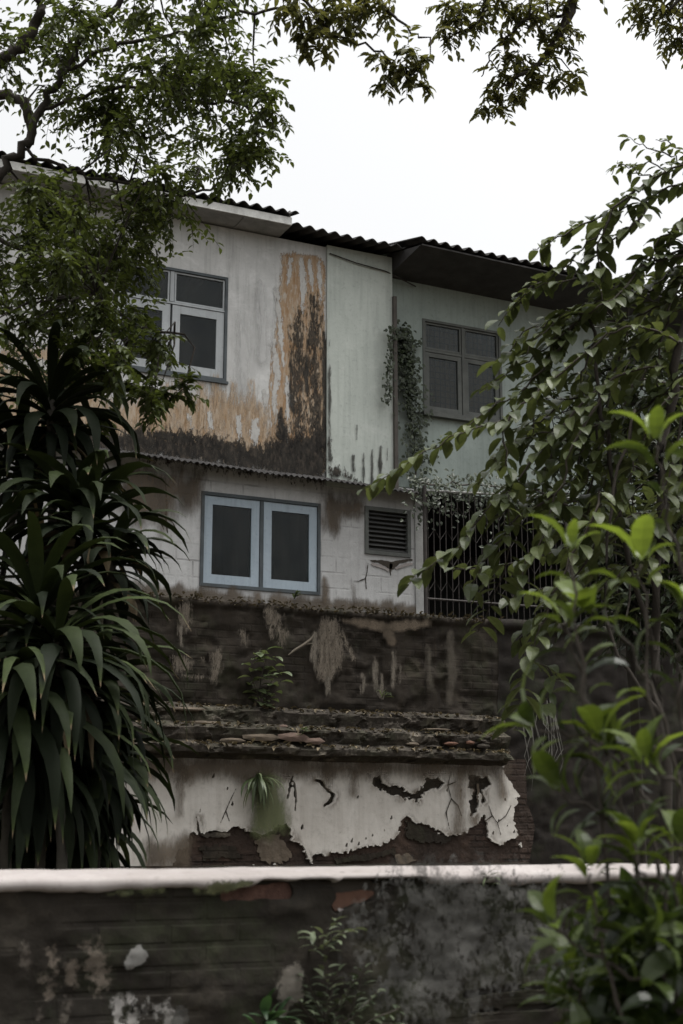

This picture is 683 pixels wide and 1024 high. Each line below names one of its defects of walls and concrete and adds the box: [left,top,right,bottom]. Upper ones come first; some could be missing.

damp [90,281,388,534]
damp [360,652,401,699]
damp [447,631,456,703]
flaking render [173,774,535,868]
crack [446,773,461,829]
damp [331,874,421,1011]
damp [490,876,577,995]